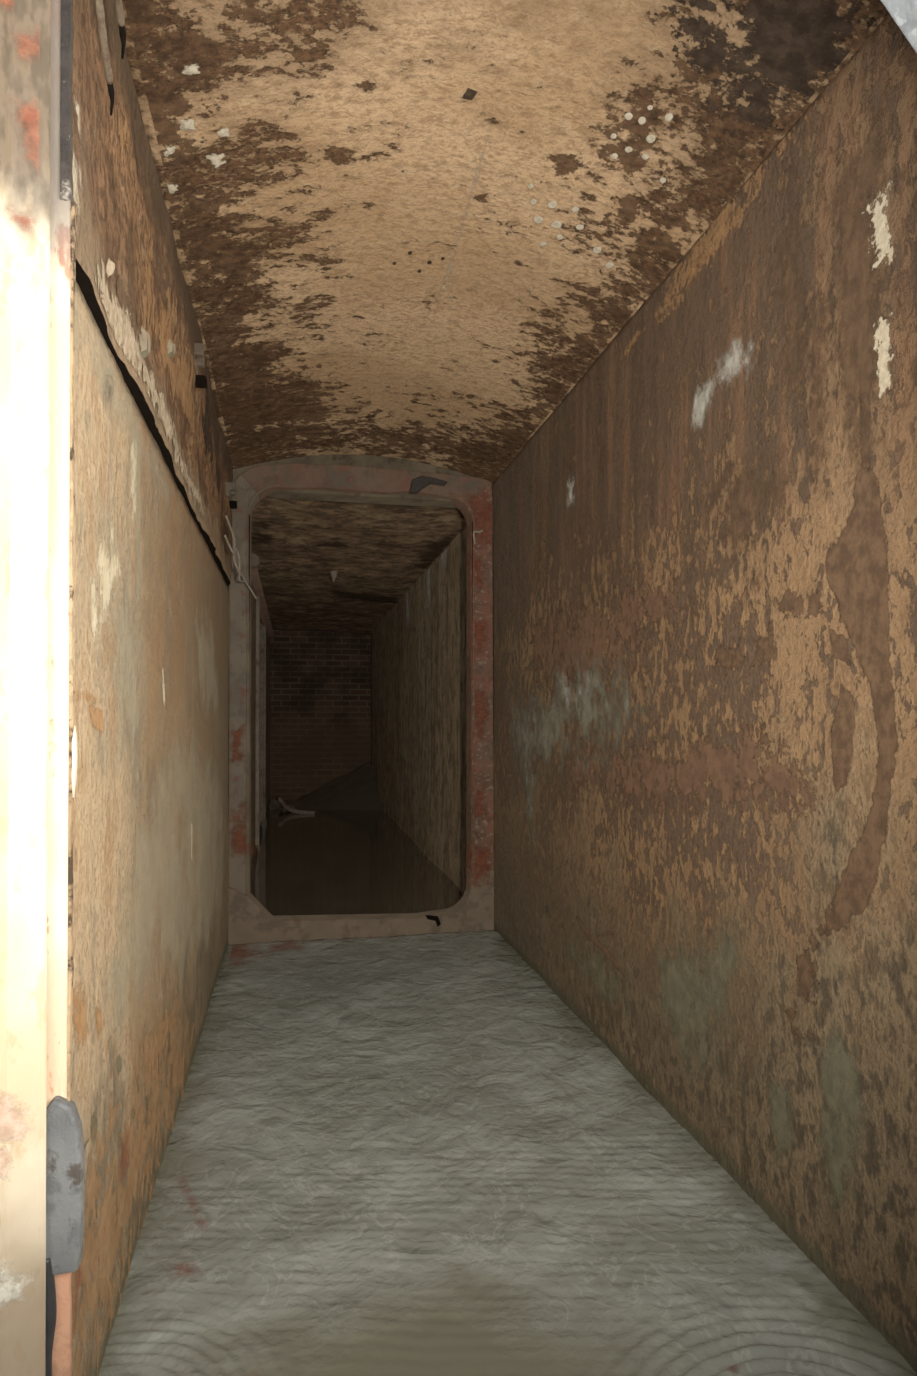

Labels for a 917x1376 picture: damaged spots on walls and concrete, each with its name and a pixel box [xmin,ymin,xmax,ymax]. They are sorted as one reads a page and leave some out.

damp [108,147,173,331]
peeling [95,0,886,520]
damp [528,183,584,247]
damp [610,105,673,160]
damp [693,342,752,425]
damp [775,112,892,496]
peeling [862,181,894,270]
peeling [714,312,898,1043]